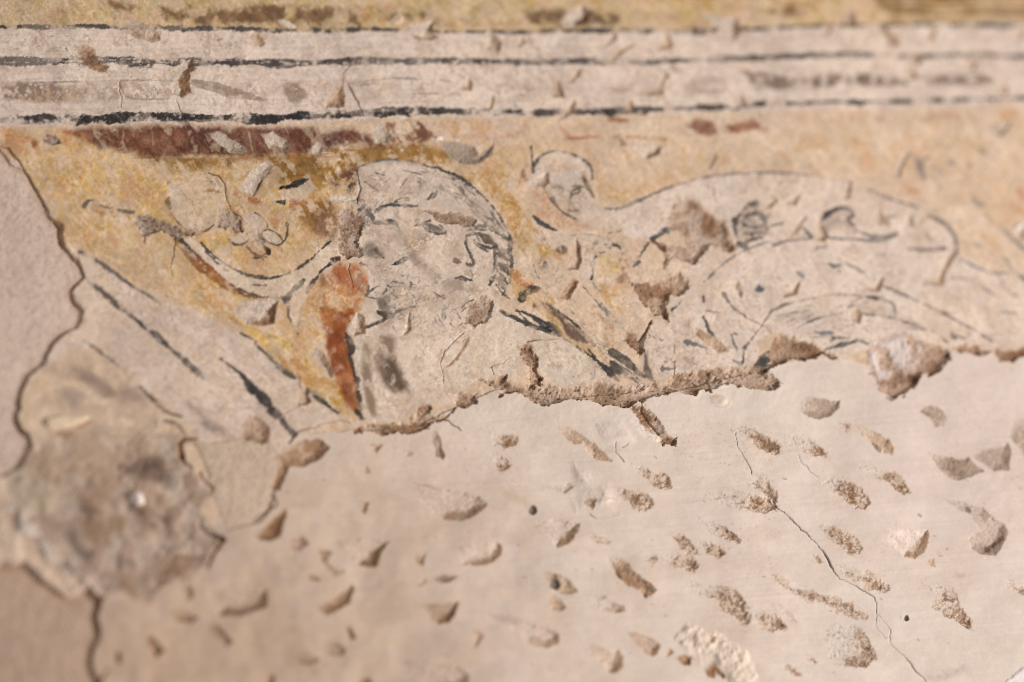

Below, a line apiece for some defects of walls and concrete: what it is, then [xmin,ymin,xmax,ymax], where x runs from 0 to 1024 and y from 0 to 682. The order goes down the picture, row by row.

crack [0,146,86,450]
flaking render [621,198,738,357]
flaking render [353,332,838,447]
flaking render [866,333,1024,400]
crack [735,433,752,475]
crack [88,584,109,682]
crack [773,500,926,682]